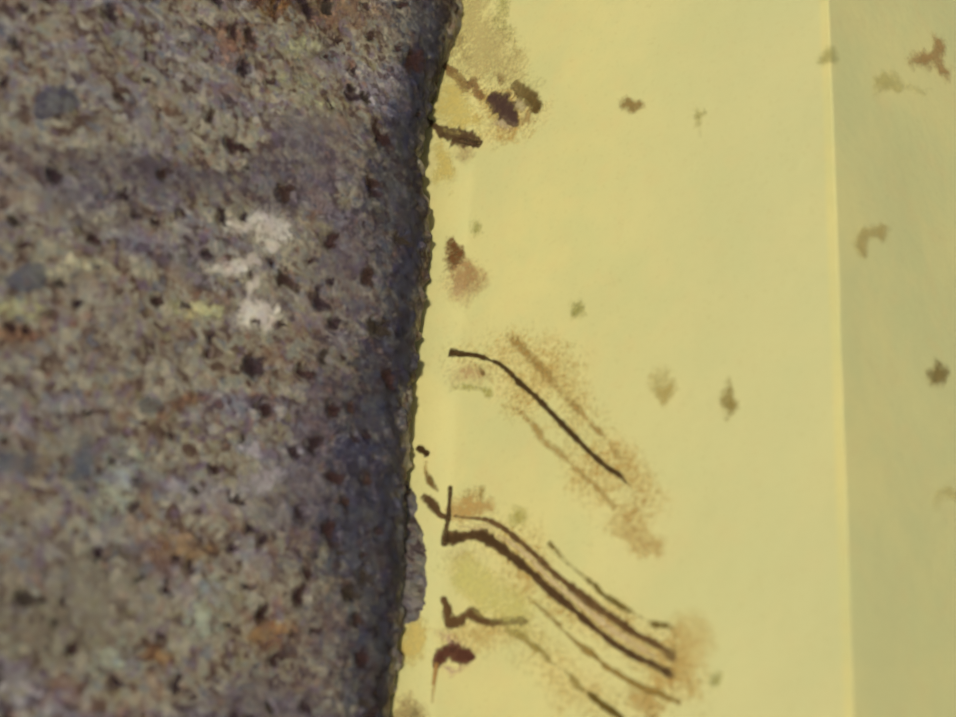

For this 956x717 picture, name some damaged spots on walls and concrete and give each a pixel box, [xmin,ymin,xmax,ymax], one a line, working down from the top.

leakage [173,203,295,336]
corrosion [446,238,484,293]